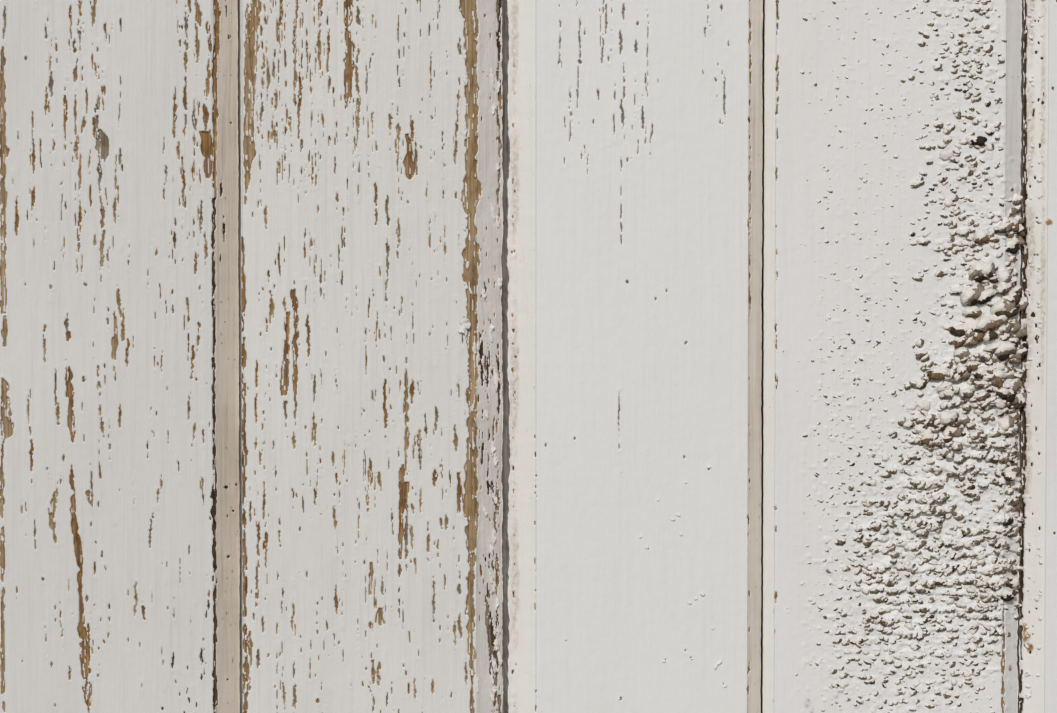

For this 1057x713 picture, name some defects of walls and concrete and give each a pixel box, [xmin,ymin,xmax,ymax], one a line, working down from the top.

peeling [0,0,123,347]
peeling [155,0,221,291]
peeling [0,378,18,712]
peeling [43,285,134,713]
peeling [128,582,146,620]
peeling [149,475,163,548]
peeling [155,283,207,385]
peeling [188,393,210,446]
peeling [241,0,517,713]